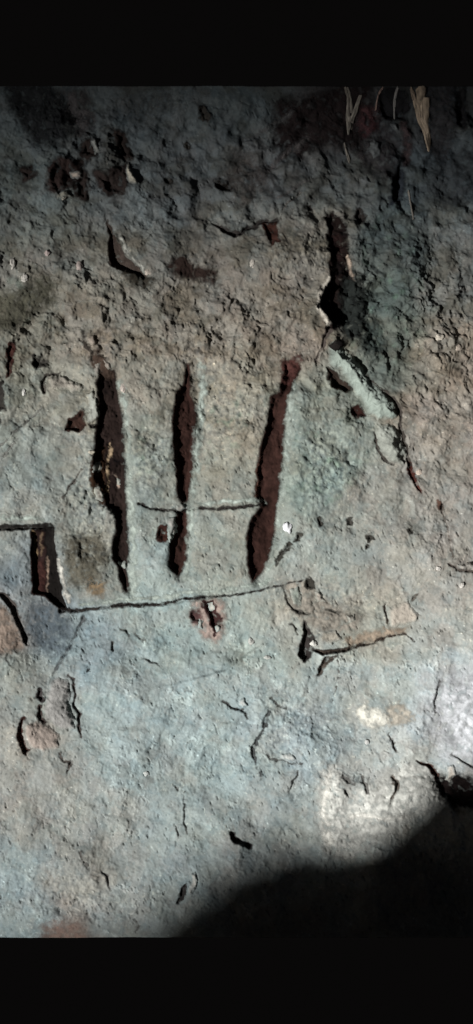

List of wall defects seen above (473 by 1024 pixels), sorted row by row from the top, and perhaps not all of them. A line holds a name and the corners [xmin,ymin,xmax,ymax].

spalling [316,208,411,466]
crack [298,620,413,701]